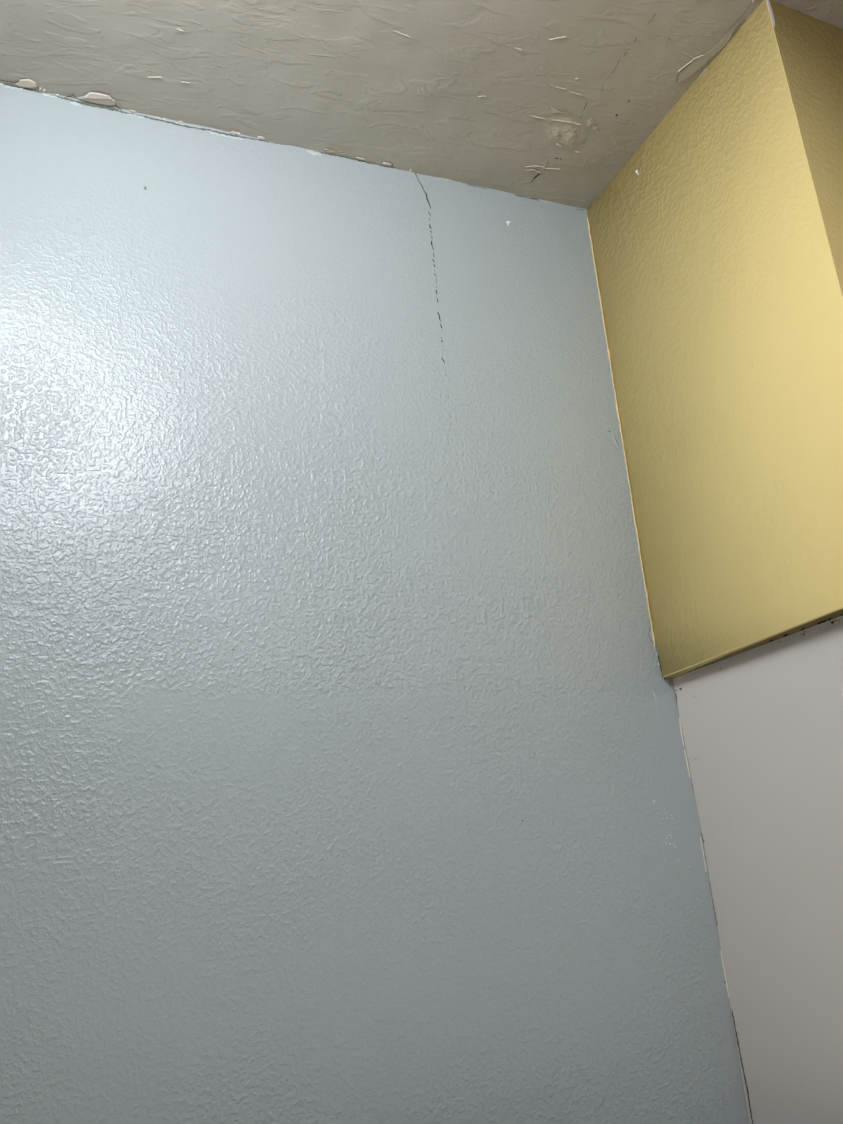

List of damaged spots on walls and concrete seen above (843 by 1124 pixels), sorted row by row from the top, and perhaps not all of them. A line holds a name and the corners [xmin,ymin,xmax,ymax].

peeling [676,0,754,84]
crack [0,83,486,398]